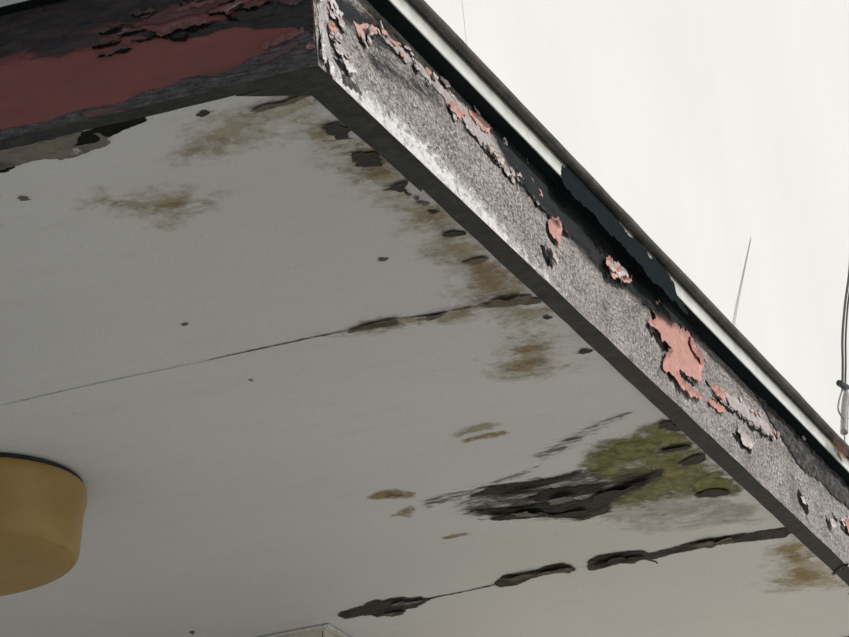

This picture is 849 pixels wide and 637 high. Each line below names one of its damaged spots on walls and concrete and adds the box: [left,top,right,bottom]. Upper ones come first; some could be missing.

peeling [0,0,570,267]
damp [101,195,187,215]
peeling [594,241,632,287]
crack [6,306,477,405]
damp [503,336,549,378]
peeling [642,299,780,454]
peeling [825,513,849,536]